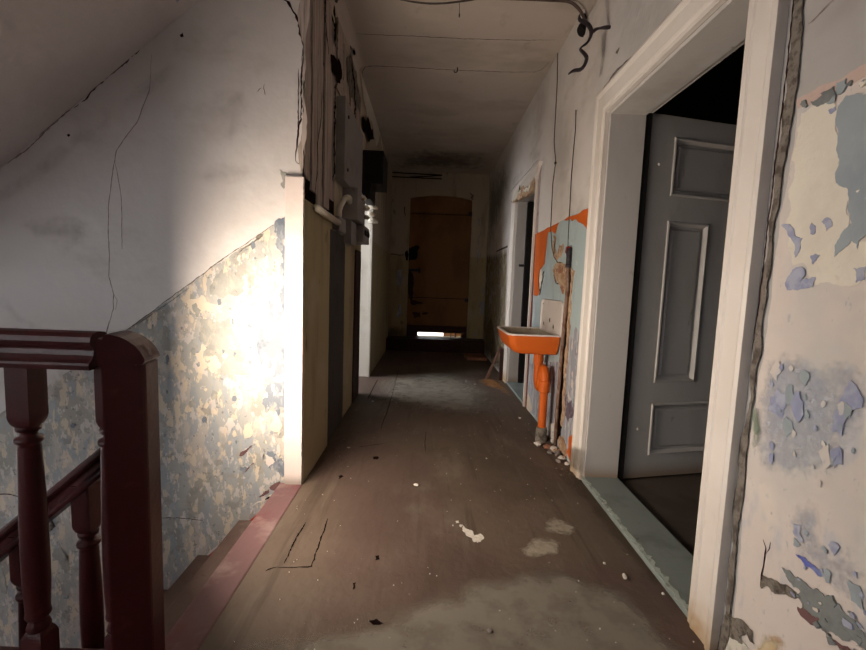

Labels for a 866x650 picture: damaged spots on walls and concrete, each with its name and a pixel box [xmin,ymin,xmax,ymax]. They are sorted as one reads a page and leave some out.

crack [284,0,304,164]
crack [7,51,275,333]
peeling [0,410,19,529]
peeling [39,370,103,491]
peeling [127,217,285,590]
peeling [511,160,588,462]
peeling [717,0,866,650]
peeling [0,556,18,647]
peeling [49,506,81,648]
peeling [98,525,108,636]